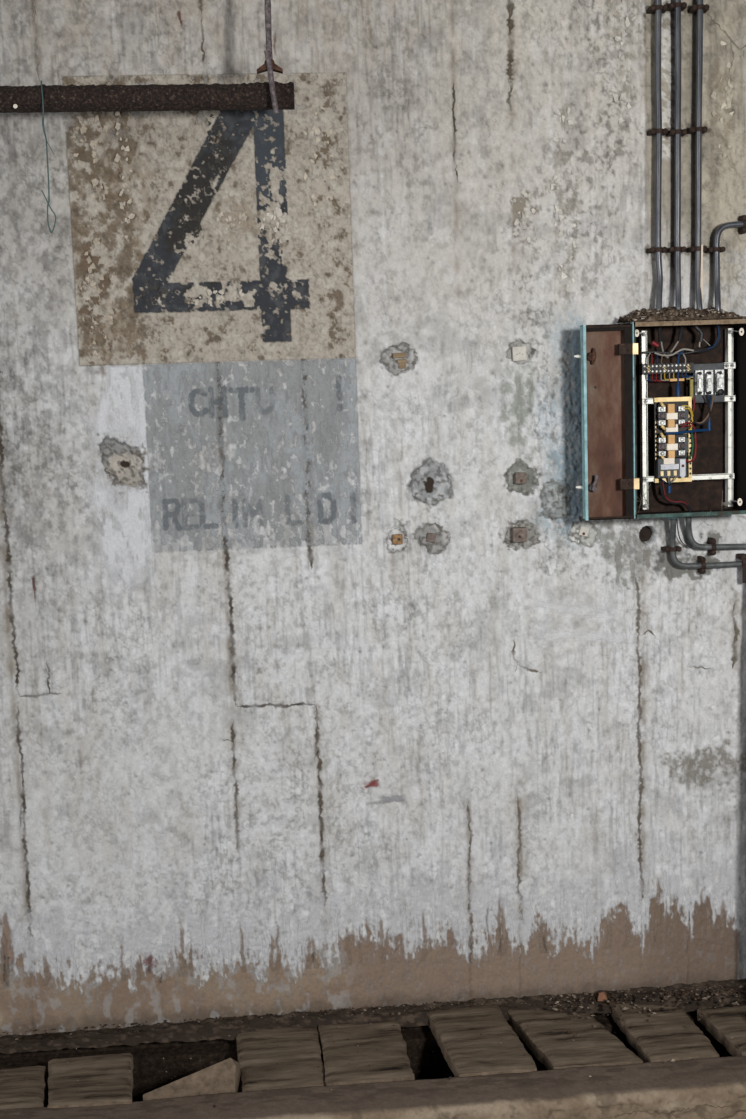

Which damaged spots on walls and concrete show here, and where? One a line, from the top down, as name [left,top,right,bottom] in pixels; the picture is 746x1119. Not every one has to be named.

crack [506,3,514,102]
spalling [379,342,418,376]
spalling [99,435,149,494]
spalling [407,458,453,506]
spalling [499,458,597,551]
spalling [385,519,450,554]
leakage [0,856,746,1037]
crack [602,1104,740,1119]